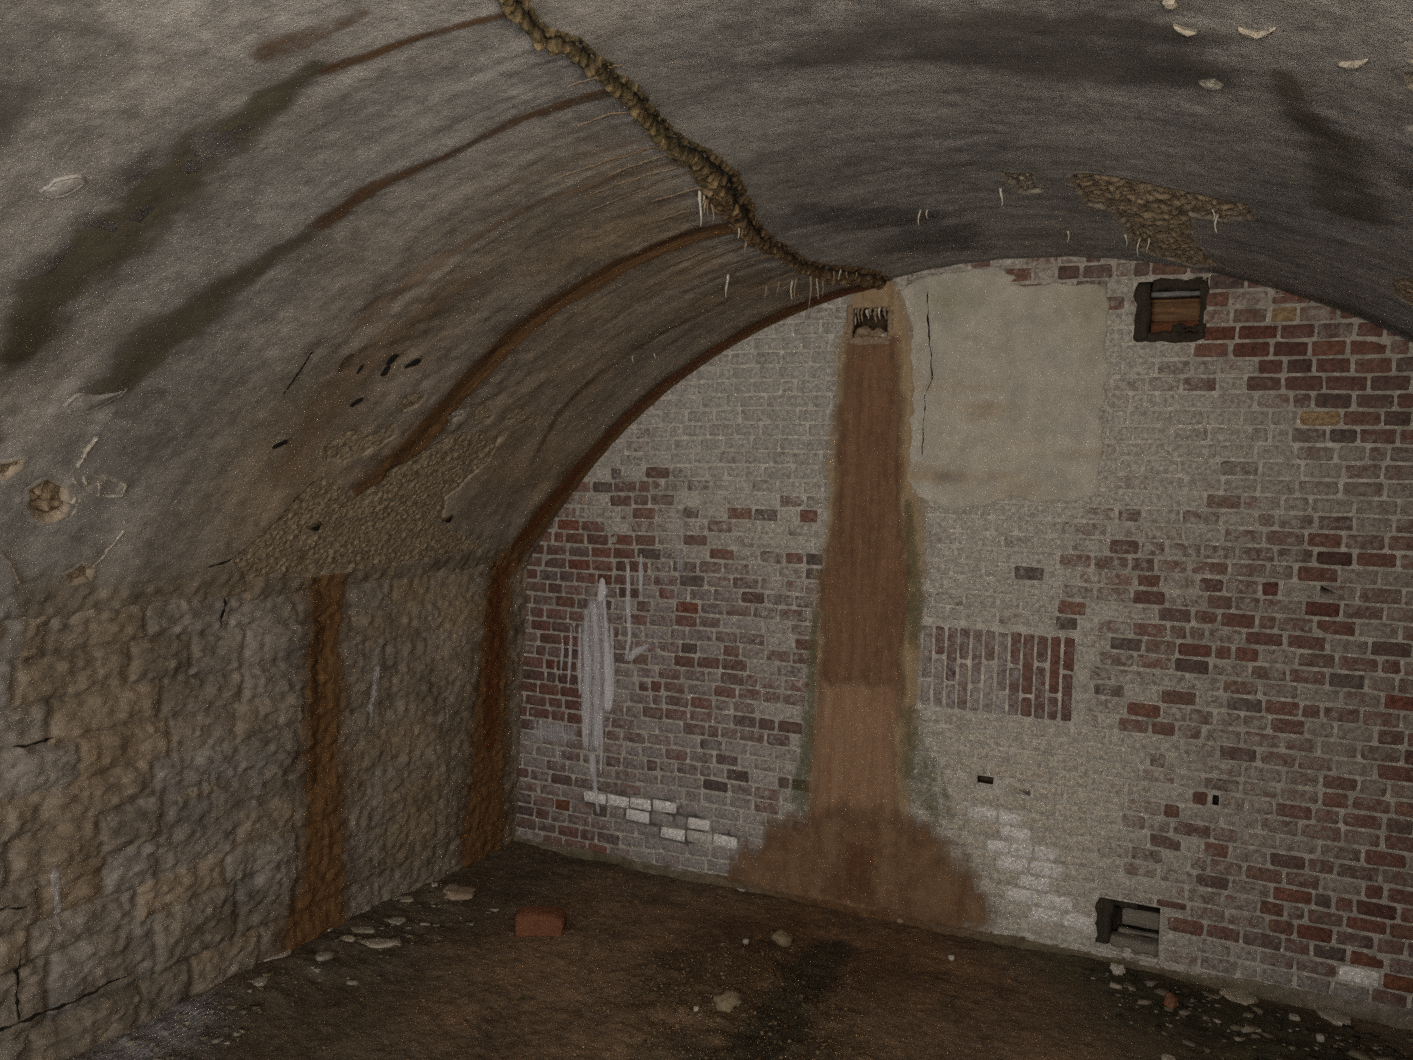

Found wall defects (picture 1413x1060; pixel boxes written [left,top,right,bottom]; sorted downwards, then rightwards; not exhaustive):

crack [498,0,892,319]
spalling [1063,171,1261,268]
spalling [1337,59,1368,71]
spalling [0,454,75,527]
rust [273,573,349,955]
spalling [229,404,506,587]
rust [352,222,732,496]
efflorescence [534,554,649,813]
rust [460,281,988,931]
crack [922,292,933,454]